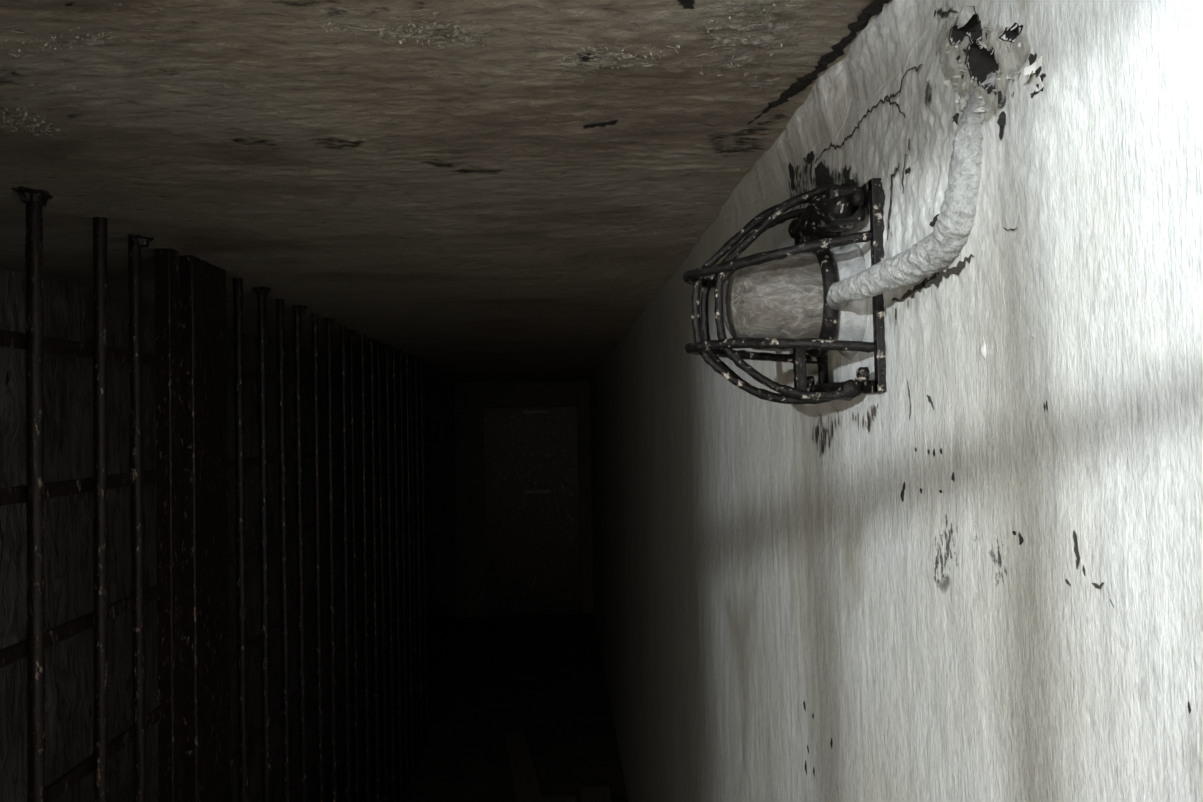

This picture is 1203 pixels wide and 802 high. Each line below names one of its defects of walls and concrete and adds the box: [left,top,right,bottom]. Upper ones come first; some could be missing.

crack [814,64,923,239]
spalling [936,6,1046,140]